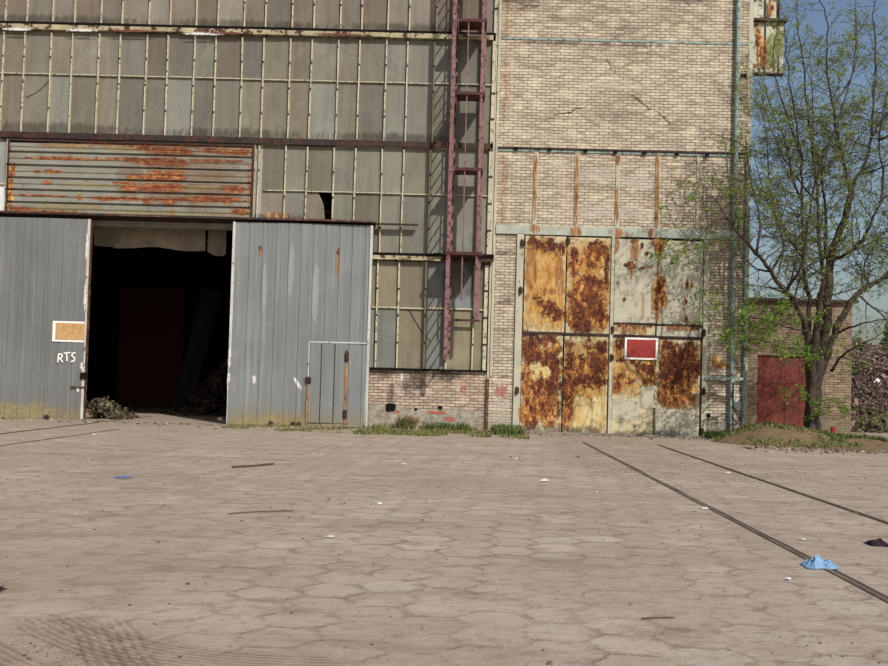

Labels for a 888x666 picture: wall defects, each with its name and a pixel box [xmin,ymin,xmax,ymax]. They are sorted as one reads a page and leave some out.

corrosion [4,142,259,215]
corrosion [518,154,730,432]